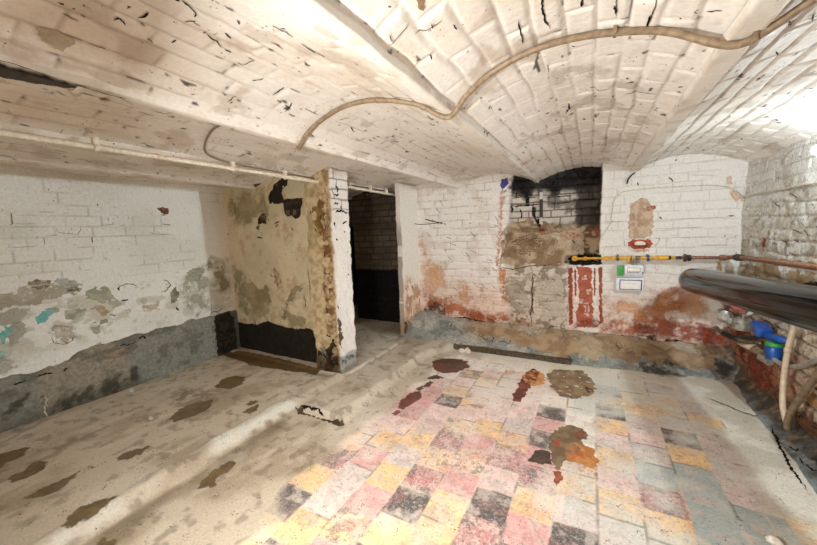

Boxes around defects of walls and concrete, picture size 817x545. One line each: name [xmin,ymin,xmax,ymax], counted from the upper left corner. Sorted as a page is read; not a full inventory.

spalling [256,198,303,238]
peeling [628,198,662,252]
peeling [0,278,138,358]
peeling [162,280,179,311]
peeling [245,268,281,323]
peeling [281,285,306,327]
spalling [318,305,344,372]
spalling [471,197,604,357]
damp [2,393,30,415]
damp [40,373,121,417]
damp [168,376,246,422]
crack [709,398,817,491]